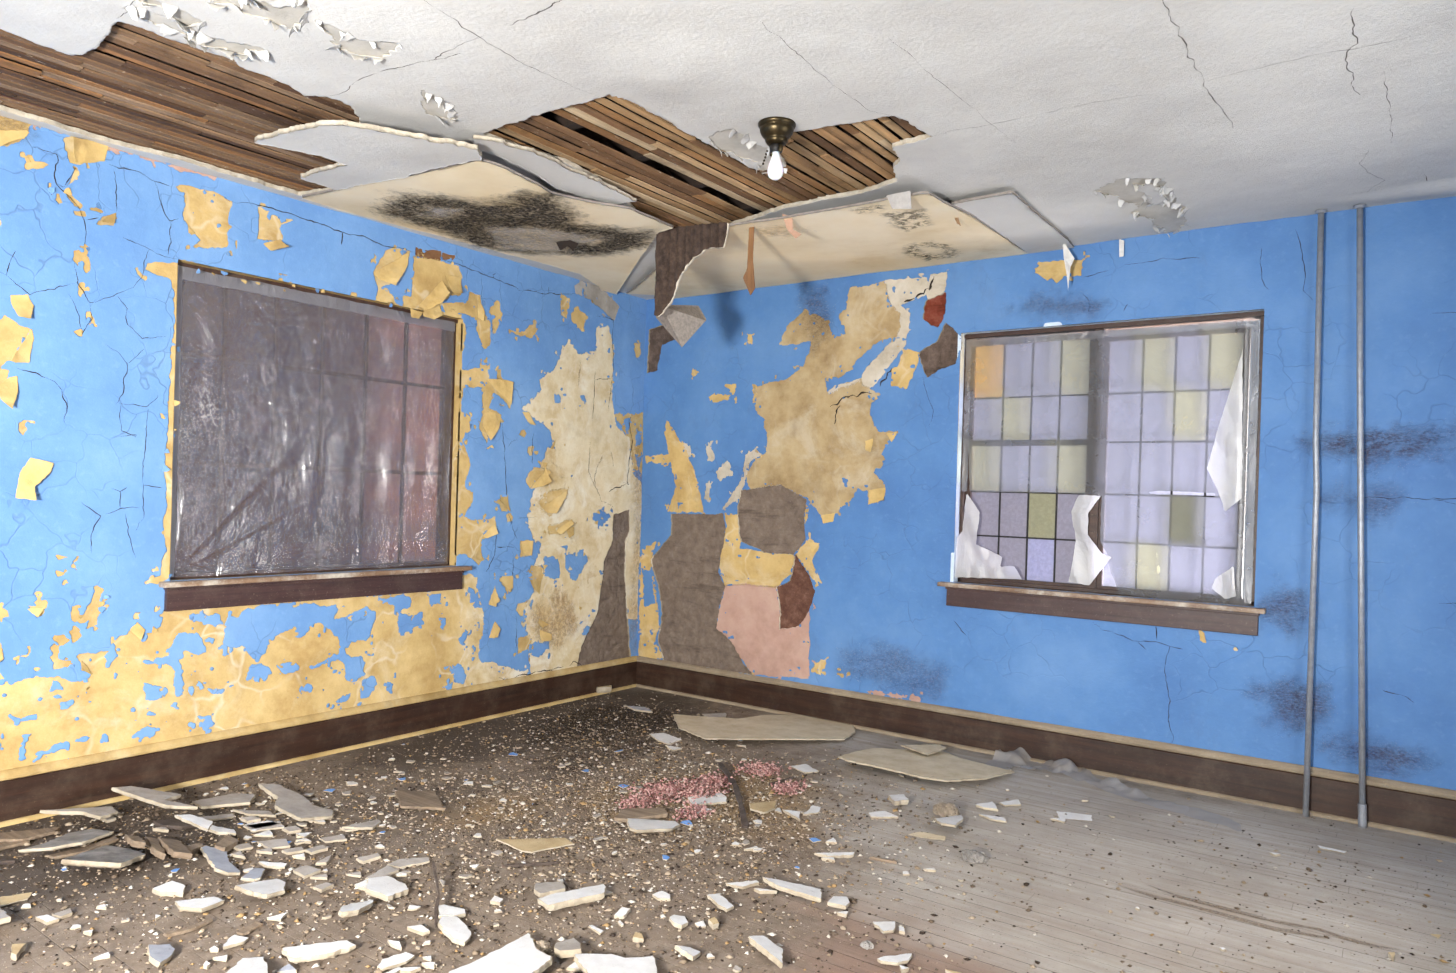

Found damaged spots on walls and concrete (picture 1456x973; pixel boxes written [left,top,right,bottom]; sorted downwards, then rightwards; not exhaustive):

peeling [126,0,402,64]
crack [332,0,600,97]
crack [1162,0,1421,186]
peeling [709,129,787,174]
peeling [257,203,293,251]
crack [227,200,412,252]
damp [378,193,651,255]
peeling [1093,178,1191,237]
crack [6,147,176,555]
peeling [0,116,260,584]
crack [446,260,633,507]
peeling [0,244,962,771]